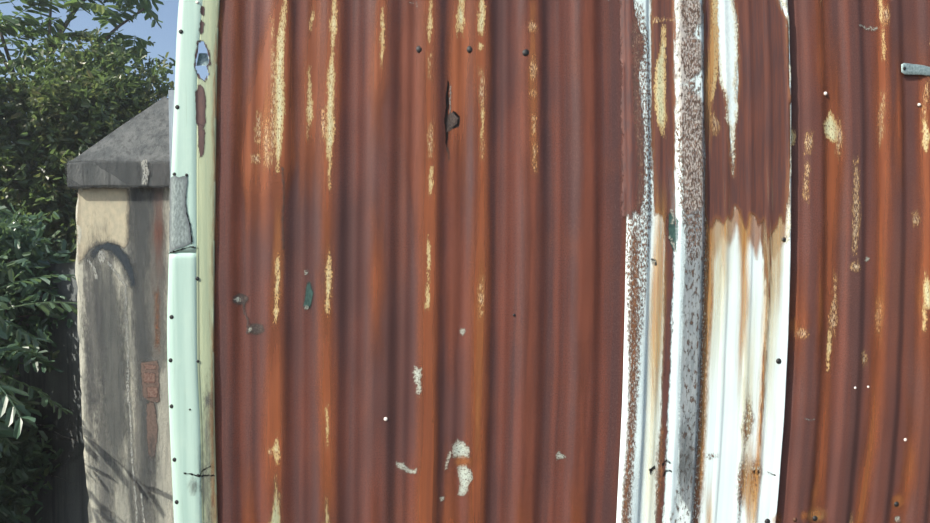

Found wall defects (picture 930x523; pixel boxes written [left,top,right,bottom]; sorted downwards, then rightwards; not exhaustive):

damp [30,406,74,473]
damp [69,159,168,523]
corrosion [233,0,341,502]
corrosion [400,0,455,523]
crack [444,81,460,159]
peeling [445,439,473,496]
corrosion [448,0,490,523]
corrosion [520,0,540,513]
corrosion [618,0,792,523]
corrosion [789,0,843,340]
corrosion [849,0,903,523]
corrosion [917,82,930,343]